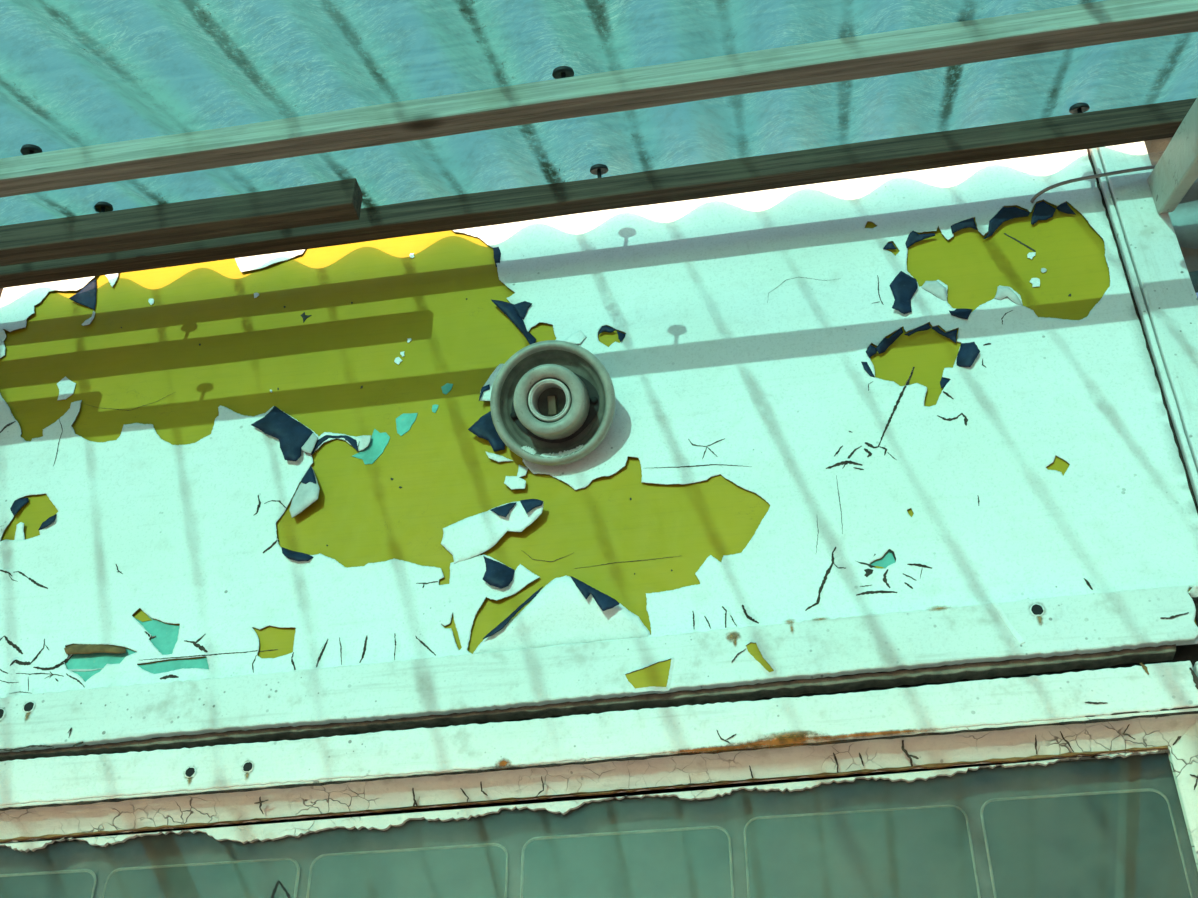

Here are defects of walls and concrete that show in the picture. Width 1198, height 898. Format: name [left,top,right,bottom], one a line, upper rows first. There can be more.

peeling [861,201,1110,407]
crack [937,389,968,426]
peeling [0,231,770,658]
crack [802,367,932,611]
peeling [857,549,896,577]
crack [0,634,84,694]
peeling [64,610,209,682]
peeling [622,657,675,693]
peeling [743,640,777,676]
rust [672,729,934,753]
crack [833,753,864,772]
crack [901,740,919,767]